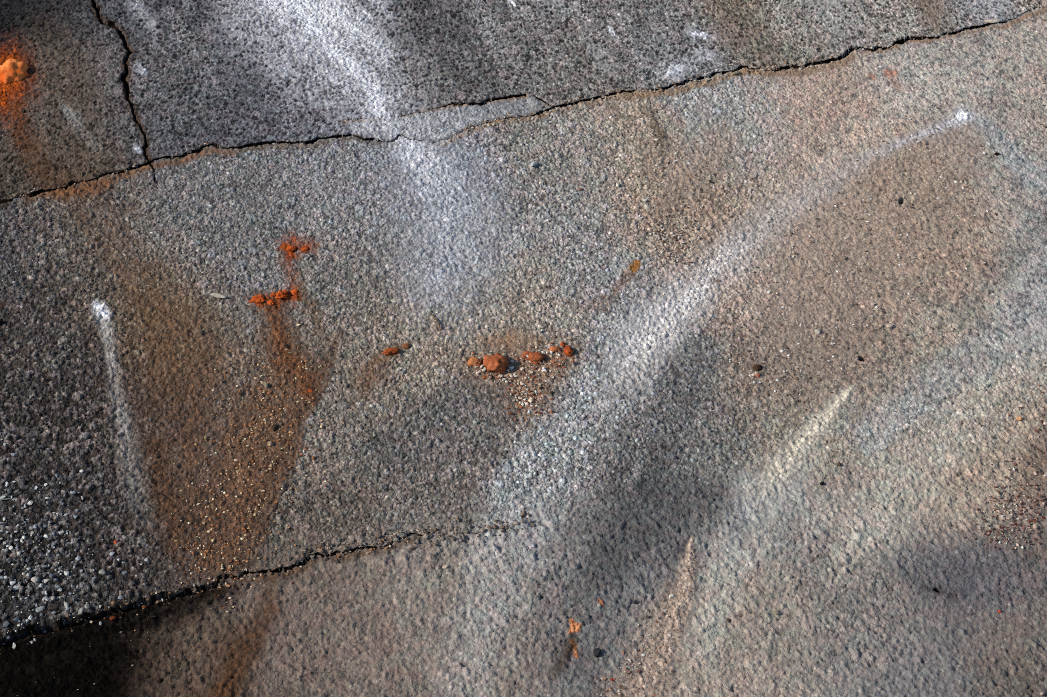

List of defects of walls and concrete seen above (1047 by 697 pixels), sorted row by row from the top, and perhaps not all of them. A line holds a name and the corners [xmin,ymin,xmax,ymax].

corrosion [0,47,32,121]
crack [0,0,1047,207]
crack [0,532,442,647]